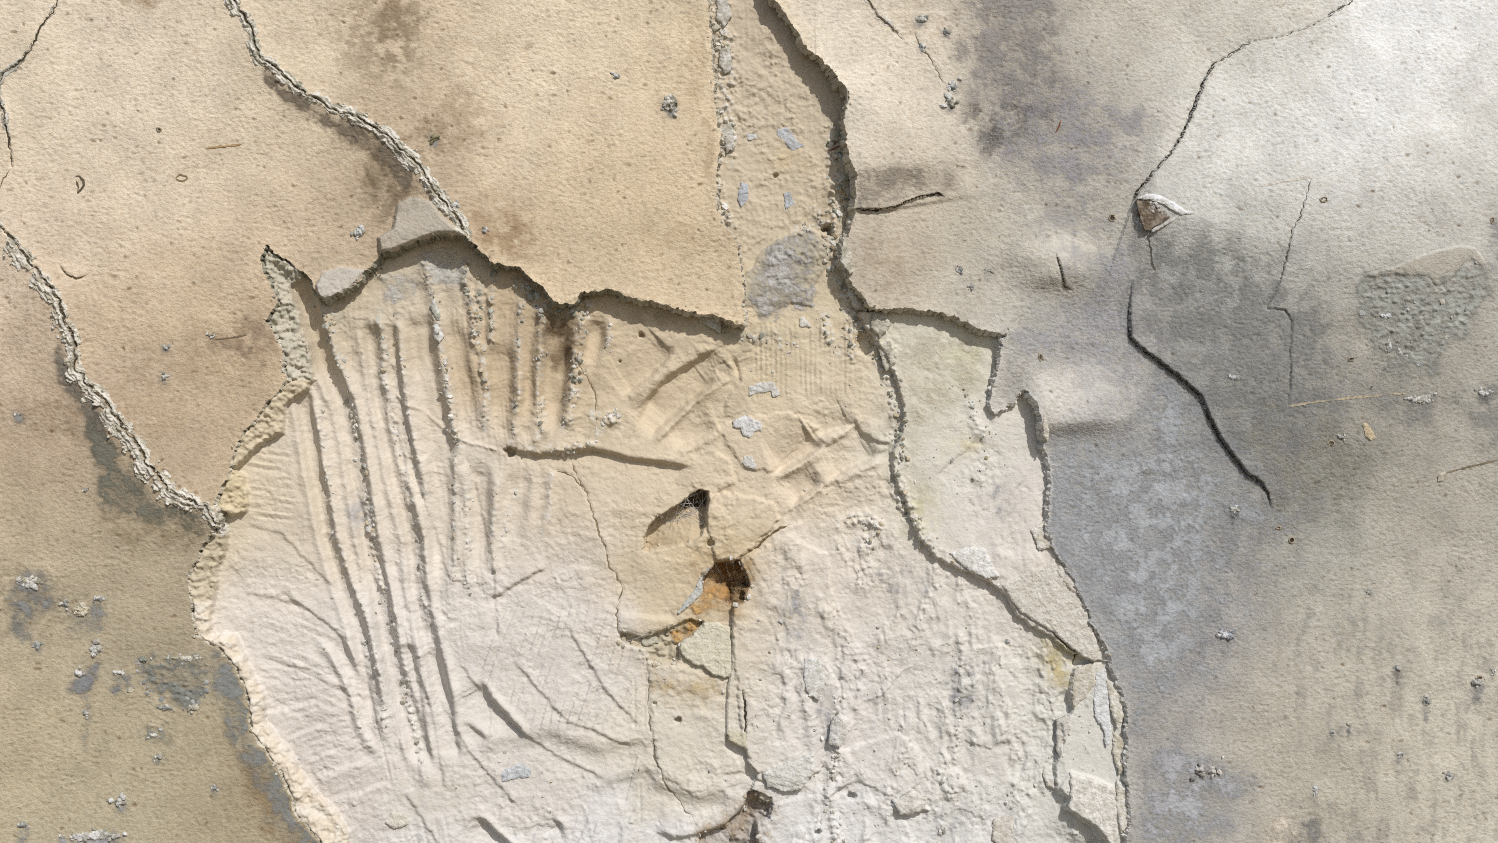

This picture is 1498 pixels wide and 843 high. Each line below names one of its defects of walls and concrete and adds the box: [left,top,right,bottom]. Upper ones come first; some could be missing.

crack [224,0,473,244]
crack [1134,0,1353,198]
crack [0,0,231,537]
spalling [187,0,1131,843]
crack [1127,284,1271,506]
crack [1267,181,1311,405]
peeling [1356,261,1491,380]
rust [671,558,752,643]
rust [699,791,769,843]